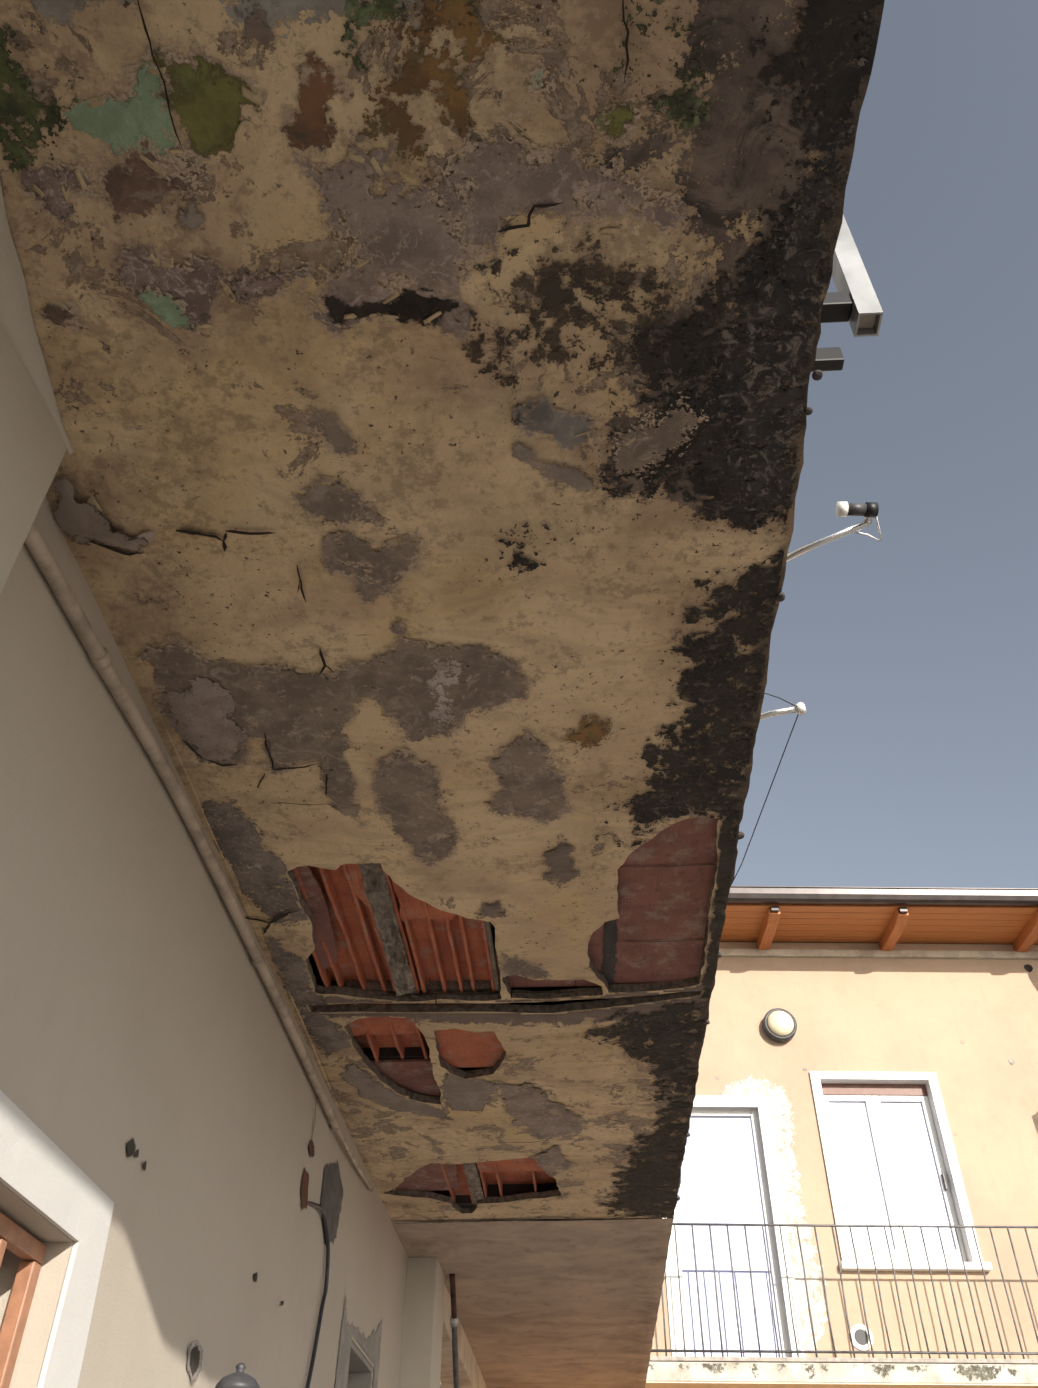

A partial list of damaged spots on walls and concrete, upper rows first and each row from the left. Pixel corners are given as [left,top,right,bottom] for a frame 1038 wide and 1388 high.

crack [137,0,184,152]
peeling [206,0,365,42]
crack [621,0,629,81]
crack [498,202,564,232]
peeling [15,38,709,492]
flaking render [53,467,155,553]
crack [176,529,274,556]
water stain [303,0,883,1219]
crack [318,649,333,676]
crack [185,733,344,815]
spalling [202,800,717,1207]
peeling [335,1297,382,1388]